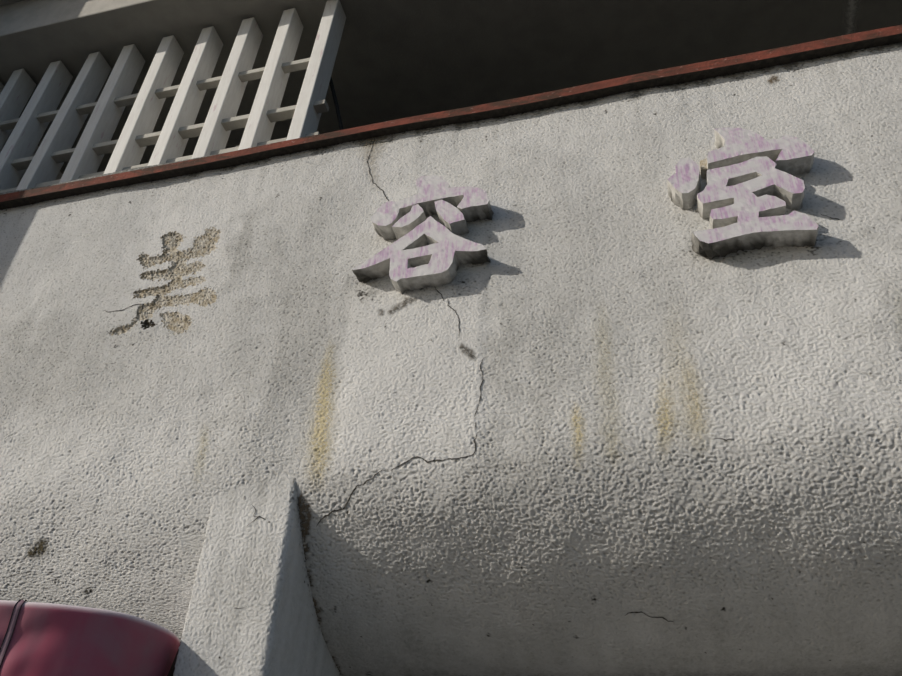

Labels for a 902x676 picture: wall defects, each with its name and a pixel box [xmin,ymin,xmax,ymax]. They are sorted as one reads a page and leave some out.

crack [367,138,389,201]
crack [317,286,487,525]